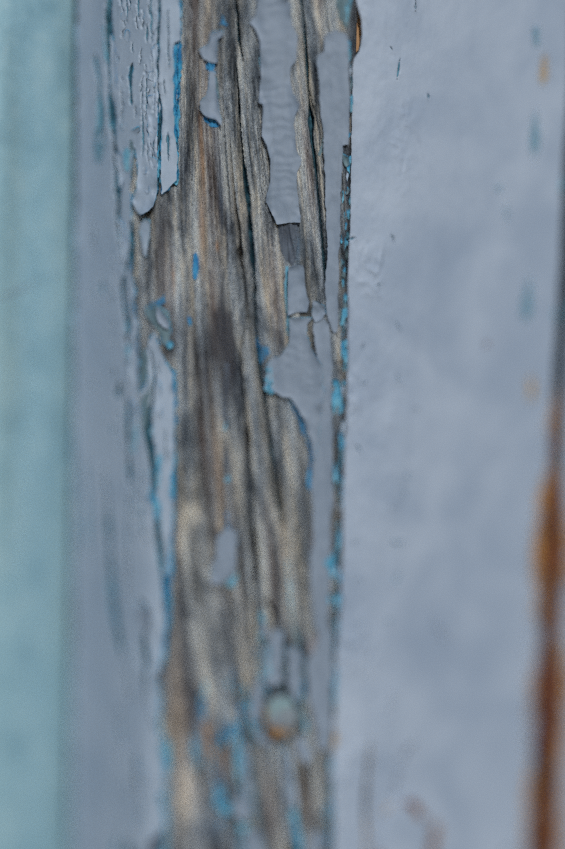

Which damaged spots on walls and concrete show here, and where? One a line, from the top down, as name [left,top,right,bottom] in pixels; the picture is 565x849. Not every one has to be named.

peeling [103,0,159,262]
peeling [173,0,183,150]
peeling [199,14,227,127]
crack [94,0,169,731]
peeling [128,335,162,433]
peeling [125,368,178,672]
crack [192,310,207,438]
peeling [210,512,238,594]
crack [234,0,306,706]
peeling [232,0,362,849]
crack [301,0,353,715]
rust [526,395,565,849]